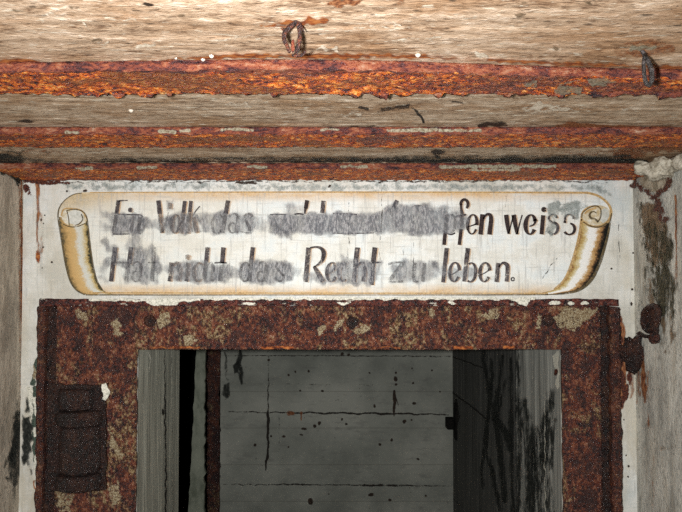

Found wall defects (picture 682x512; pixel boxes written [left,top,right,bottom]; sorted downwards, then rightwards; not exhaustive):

corrosion [488,59,627,67]
corrosion [19,180,87,322]
leakage [636,202,678,344]
crack [223,355,488,487]
leakage [482,351,556,512]
corrosion [620,361,648,409]